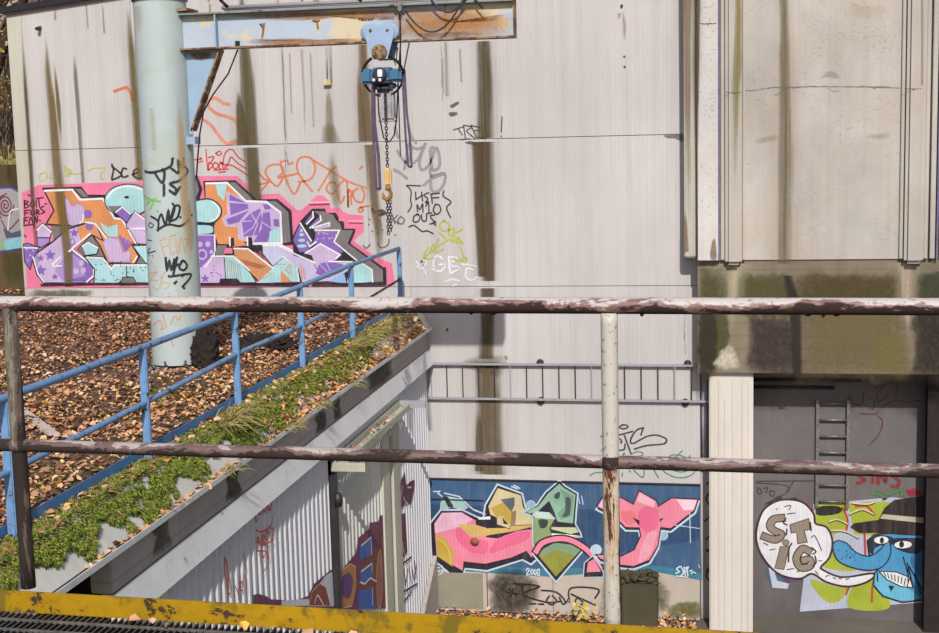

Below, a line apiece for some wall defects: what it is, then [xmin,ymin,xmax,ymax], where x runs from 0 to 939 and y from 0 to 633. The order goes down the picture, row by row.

corrosion [401,10,499,36]
damp [74,67,84,183]
damp [237,49,261,199]
crack [726,85,921,95]
damp [46,58,72,287]
damp [473,41,494,297]
damp [728,264,742,298]
damp [785,275,798,298]
damp [476,313,508,452]
damp [698,315,801,376]
damp [906,315,939,384]
damp [476,465,501,475]